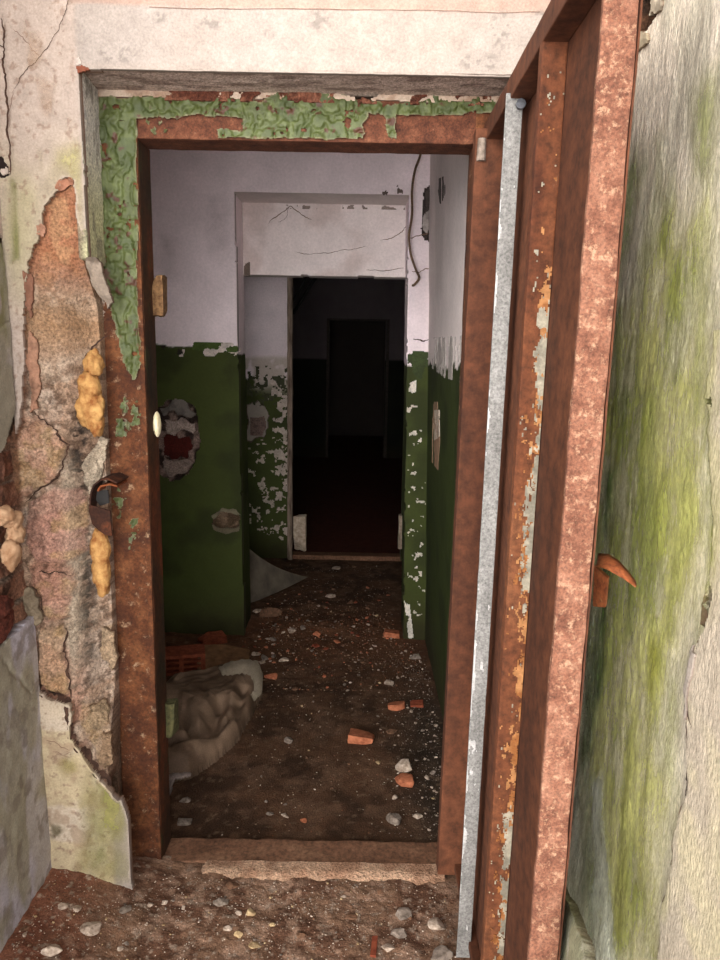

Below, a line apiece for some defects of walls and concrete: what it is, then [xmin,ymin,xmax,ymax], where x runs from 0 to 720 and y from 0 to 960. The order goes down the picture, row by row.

crack [0,0,69,174]
crack [297,227,429,254]
rust [537,265,552,316]
crack [25,411,70,503]
spalling [0,90,500,782]
rust [520,354,544,489]
crack [26,570,70,611]
crack [39,628,111,787]
rust [466,739,479,793]
rust [470,605,490,717]
rust [496,503,533,850]
damp [586,782,614,960]